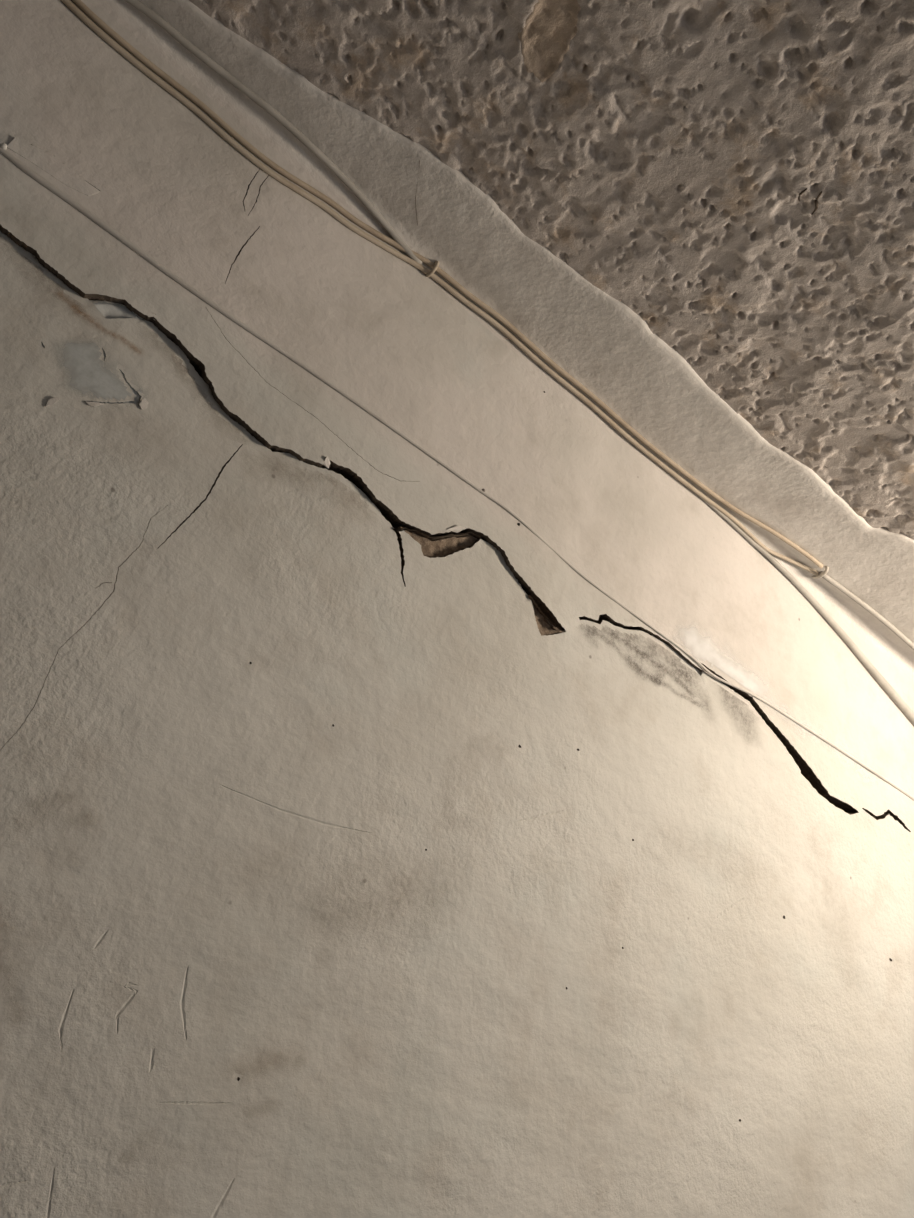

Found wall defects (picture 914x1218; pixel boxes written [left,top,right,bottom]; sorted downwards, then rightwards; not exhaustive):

crack [225,169,269,284]
crack [798,188,822,215]
crack [0,224,911,832]